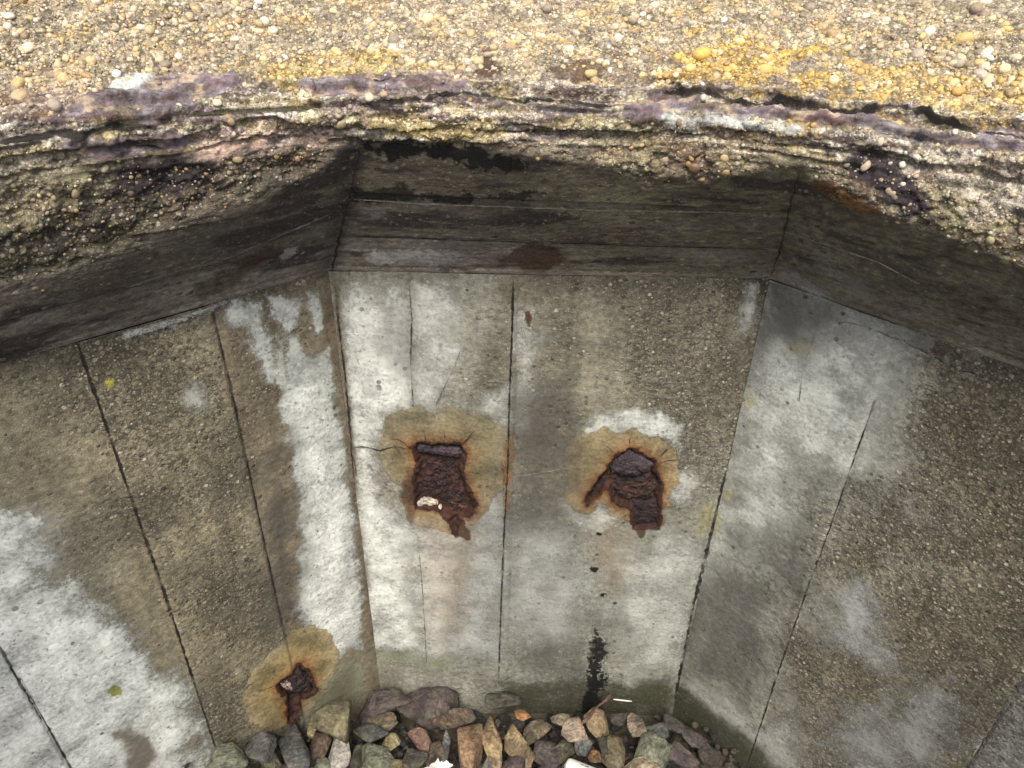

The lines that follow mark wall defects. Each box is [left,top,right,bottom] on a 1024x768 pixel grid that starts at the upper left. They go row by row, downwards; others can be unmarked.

water stain [358,136,536,175]
spalling [0,0,1024,283]
corrosion [501,244,564,272]
water stain [266,281,583,659]
corrosion [376,405,515,540]
water stain [564,503,615,534]
corrosion [563,426,680,538]
water stain [579,312,898,714]
water stain [0,509,211,768]
corrosion [241,625,339,731]